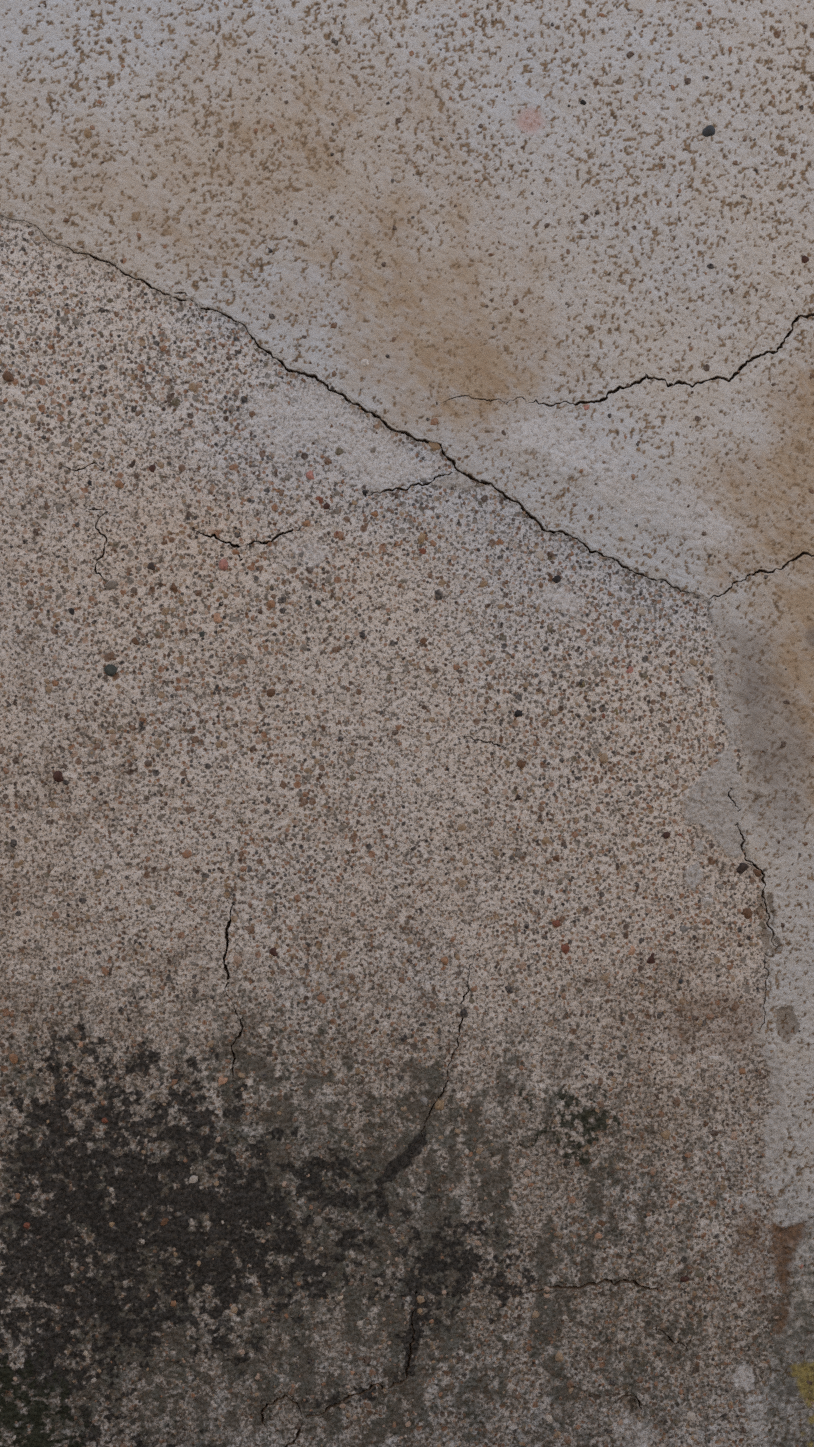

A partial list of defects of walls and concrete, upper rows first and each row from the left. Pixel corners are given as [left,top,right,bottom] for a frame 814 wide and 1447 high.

crack [0,213,814,605]
crack [465,734,506,749]
crack [726,788,778,1034]
spalling [774,1005,800,1044]
spalling [61,1099,121,1147]
spalling [177,1151,219,1187]
water stain [0,977,557,1447]
spalling [416,1273,450,1323]